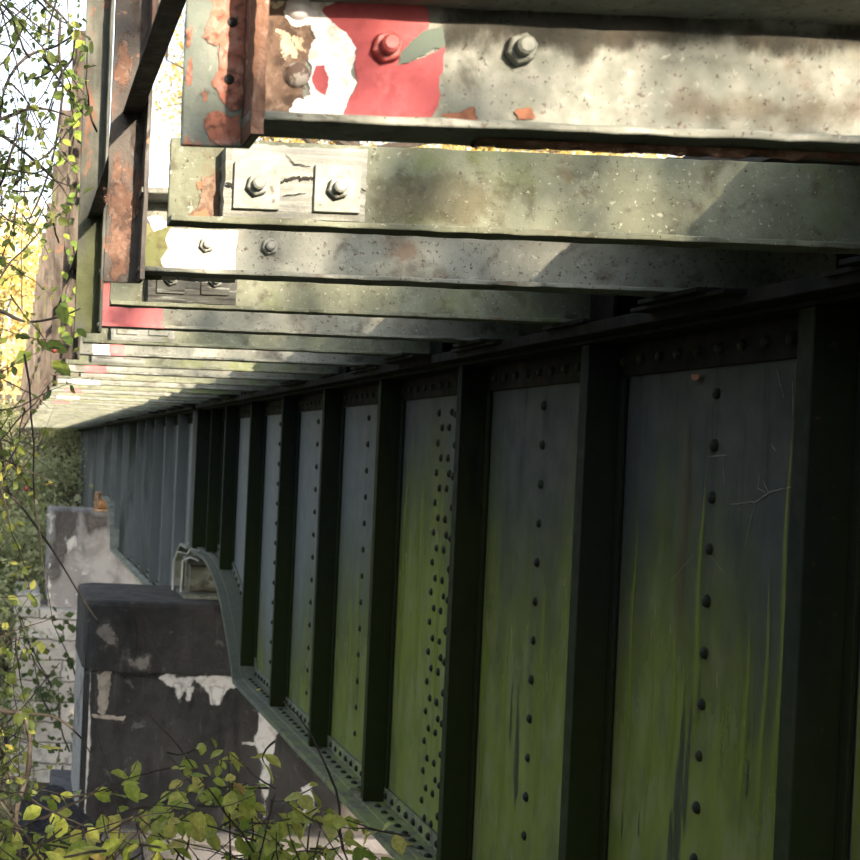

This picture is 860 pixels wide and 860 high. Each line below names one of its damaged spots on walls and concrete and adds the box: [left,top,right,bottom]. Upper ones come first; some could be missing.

corrosion [112,31,133,88]
peeling [269,1,357,114]
corrosion [442,107,477,120]
corrosion [514,107,535,120]
corrosion [103,158,141,282]
peeling [144,216,173,280]
corrosion [189,174,220,227]
crack [280,153,315,196]
water stain [774,489,788,768]
spalling [91,671,126,721]
water stain [500,632,519,809]
water stain [667,514,704,860]